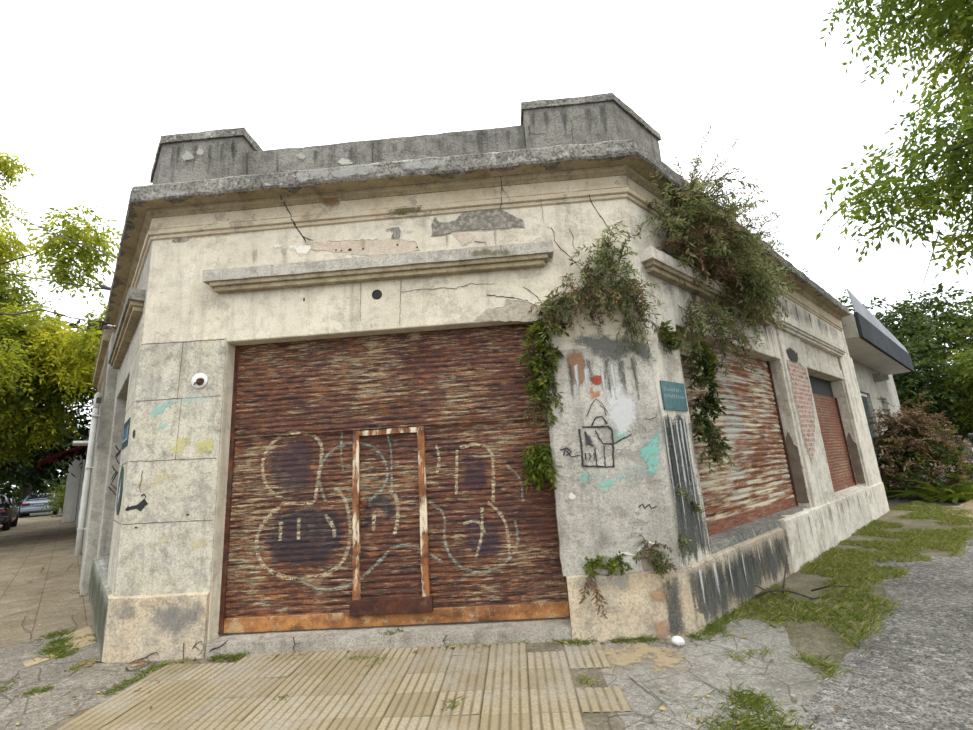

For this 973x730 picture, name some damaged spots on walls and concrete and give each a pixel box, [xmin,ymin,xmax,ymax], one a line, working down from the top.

crack [280,195,311,242]
peeling [273,225,421,256]
flaking render [430,209,527,247]
leakage [663,414,872,635]